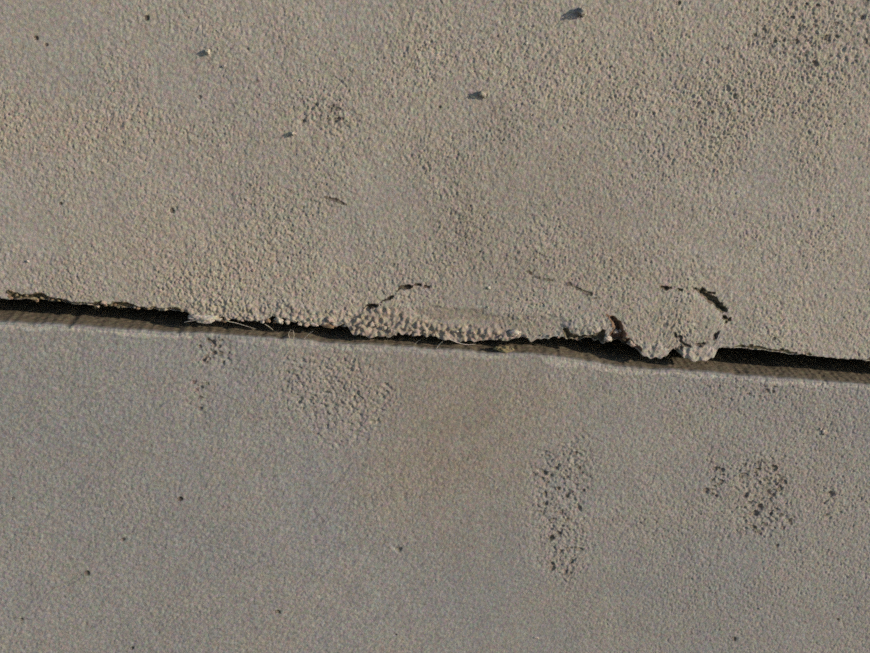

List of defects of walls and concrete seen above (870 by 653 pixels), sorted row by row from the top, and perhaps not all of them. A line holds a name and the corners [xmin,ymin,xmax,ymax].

crack [364,283,430,309]
peeling [188,291,724,362]
crack [660,285,732,352]